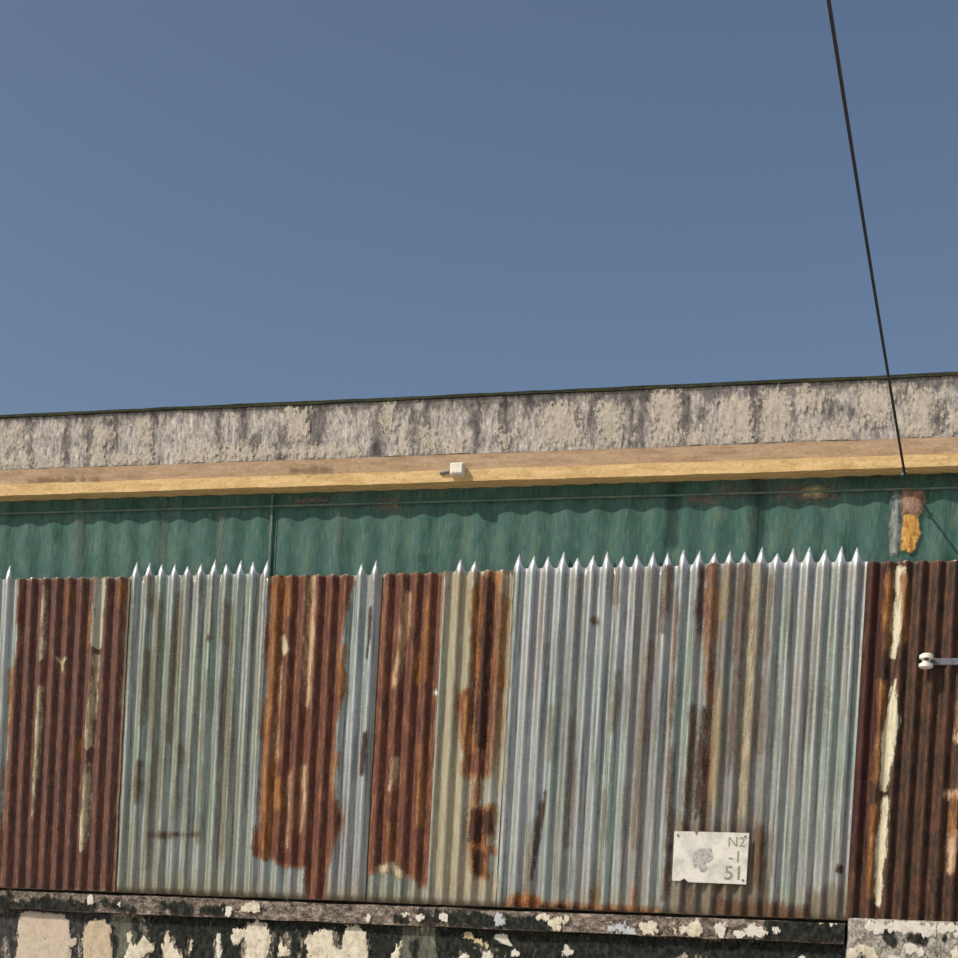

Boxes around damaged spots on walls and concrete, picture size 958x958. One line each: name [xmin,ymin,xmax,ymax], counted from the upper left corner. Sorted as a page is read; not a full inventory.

rust [0,576,130,892]
rust [250,574,356,900]
rust [359,572,445,888]
rust [454,570,512,881]
rust [835,489,958,922]
peeling [15,911,193,958]
peeling [216,900,290,958]
peeling [304,914,371,958]
peeling [463,911,520,958]
spalling [607,920,659,935]
spalling [673,918,781,939]
spalling [847,920,958,958]